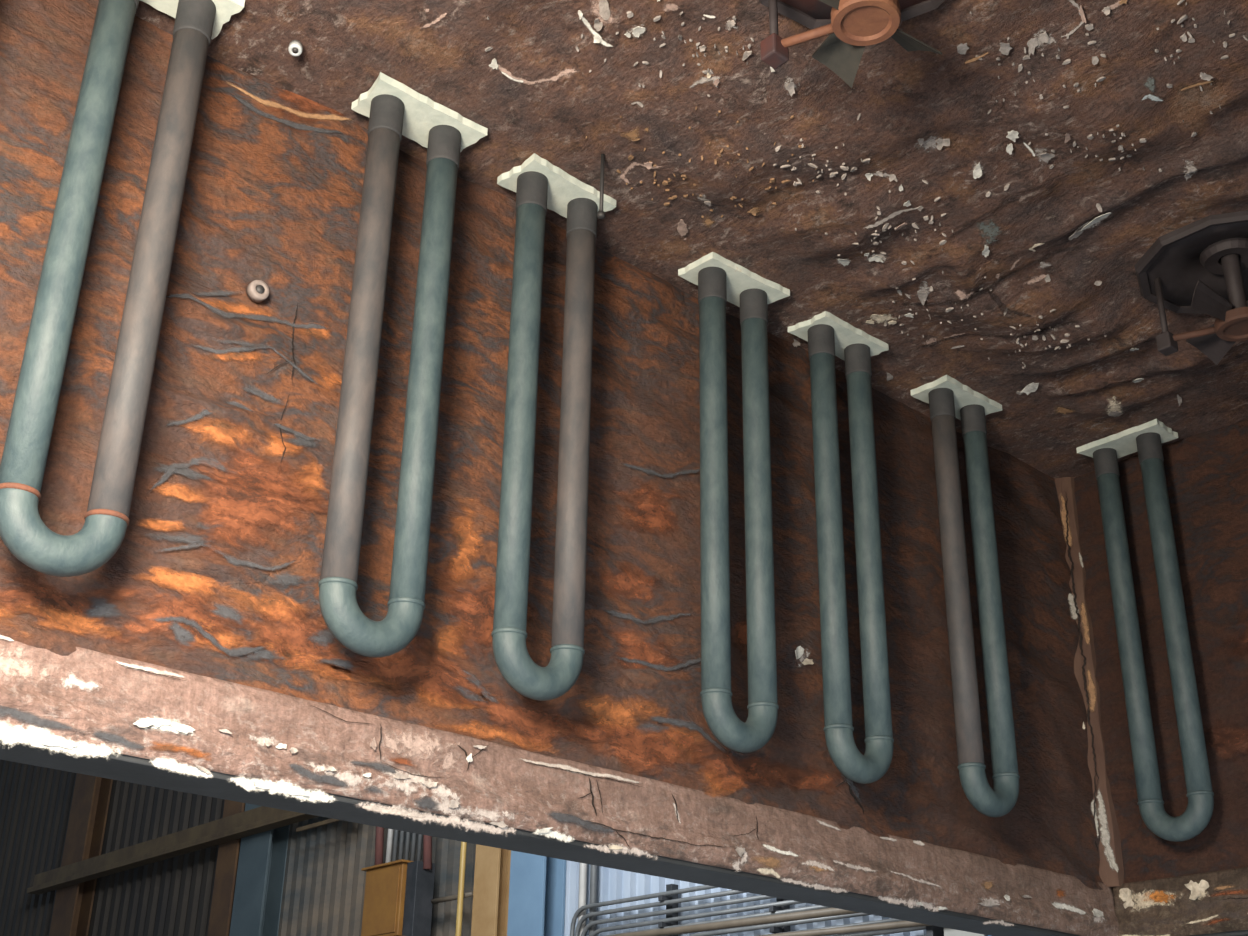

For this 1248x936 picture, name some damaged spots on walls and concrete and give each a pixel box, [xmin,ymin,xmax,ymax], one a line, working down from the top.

corrosion [199,299,271,317]
corrosion [301,325,329,339]
corrosion [212,352,262,361]
corrosion [316,367,342,389]
crack [1065,496,1099,854]
peeling [133,716,195,734]
peeling [0,722,120,757]
peeling [151,759,212,778]
peeling [231,777,335,802]
peeling [308,731,516,834]
peeling [1091,790,1119,872]
peeling [1184,880,1210,900]